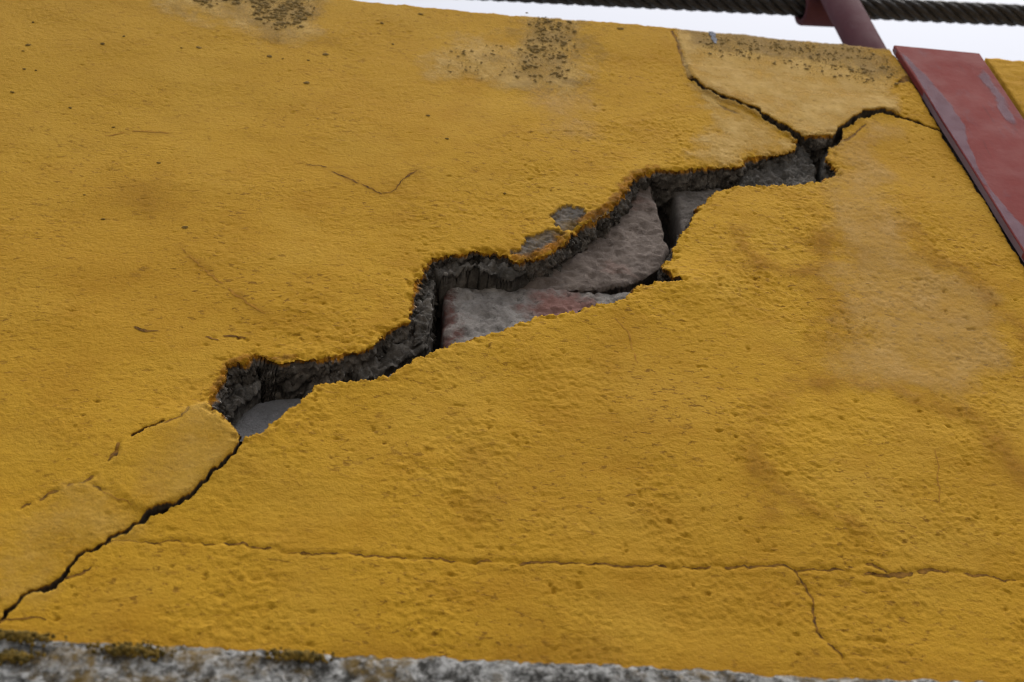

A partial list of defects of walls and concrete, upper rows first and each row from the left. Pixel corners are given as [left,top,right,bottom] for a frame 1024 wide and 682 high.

crack [671,31,804,147]
crack [831,107,940,148]
crack [307,164,417,194]
flaking render [197,29,896,445]
peeling [169,453,220,493]
crack [0,406,492,623]
crack [519,561,1016,659]